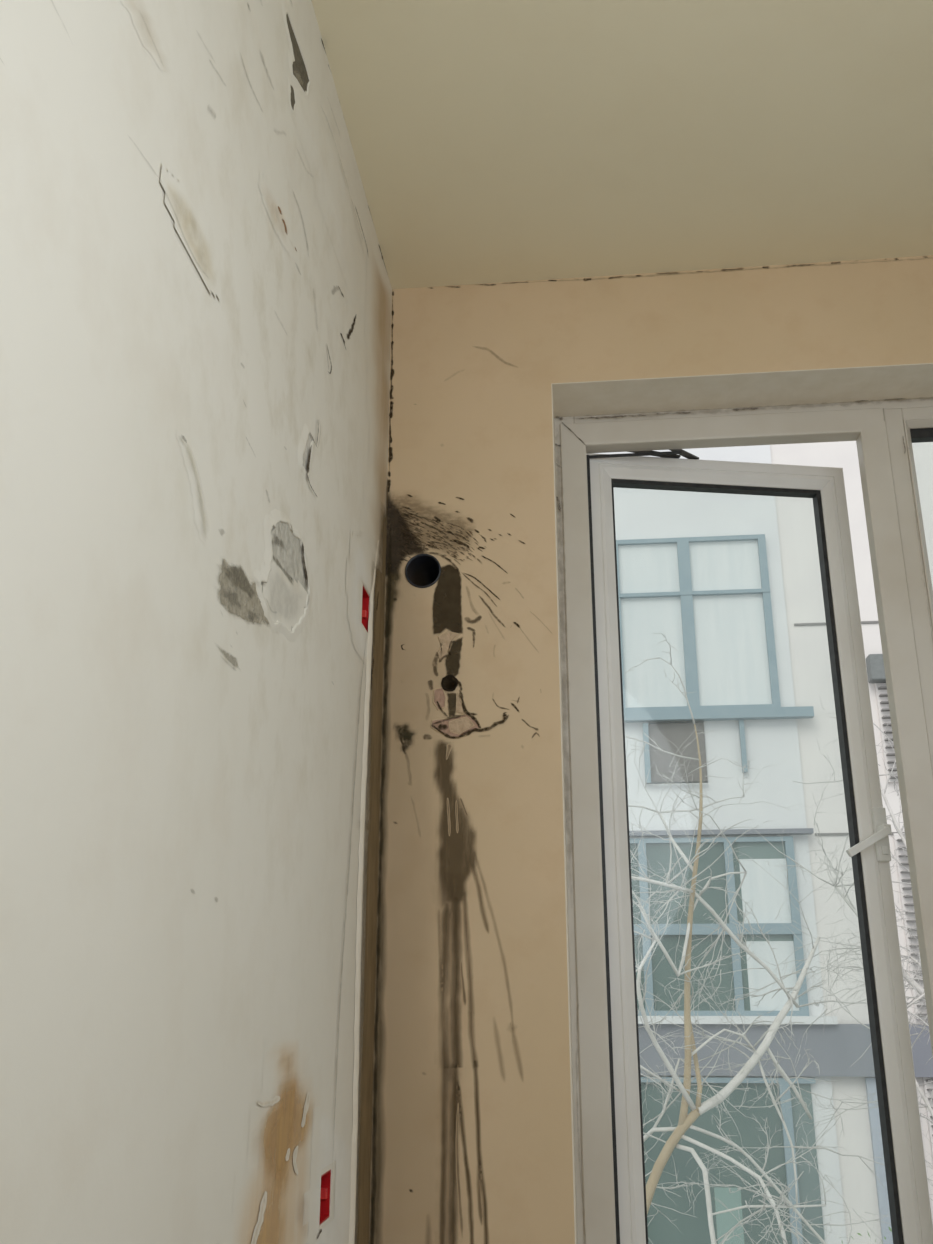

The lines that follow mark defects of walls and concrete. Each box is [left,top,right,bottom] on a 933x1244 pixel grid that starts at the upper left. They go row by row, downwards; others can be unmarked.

crack [121,0,170,72]
spalling [281,0,312,117]
spalling [219,509,313,642]
water stain [370,493,525,1244]
rust [218,1027,322,1244]